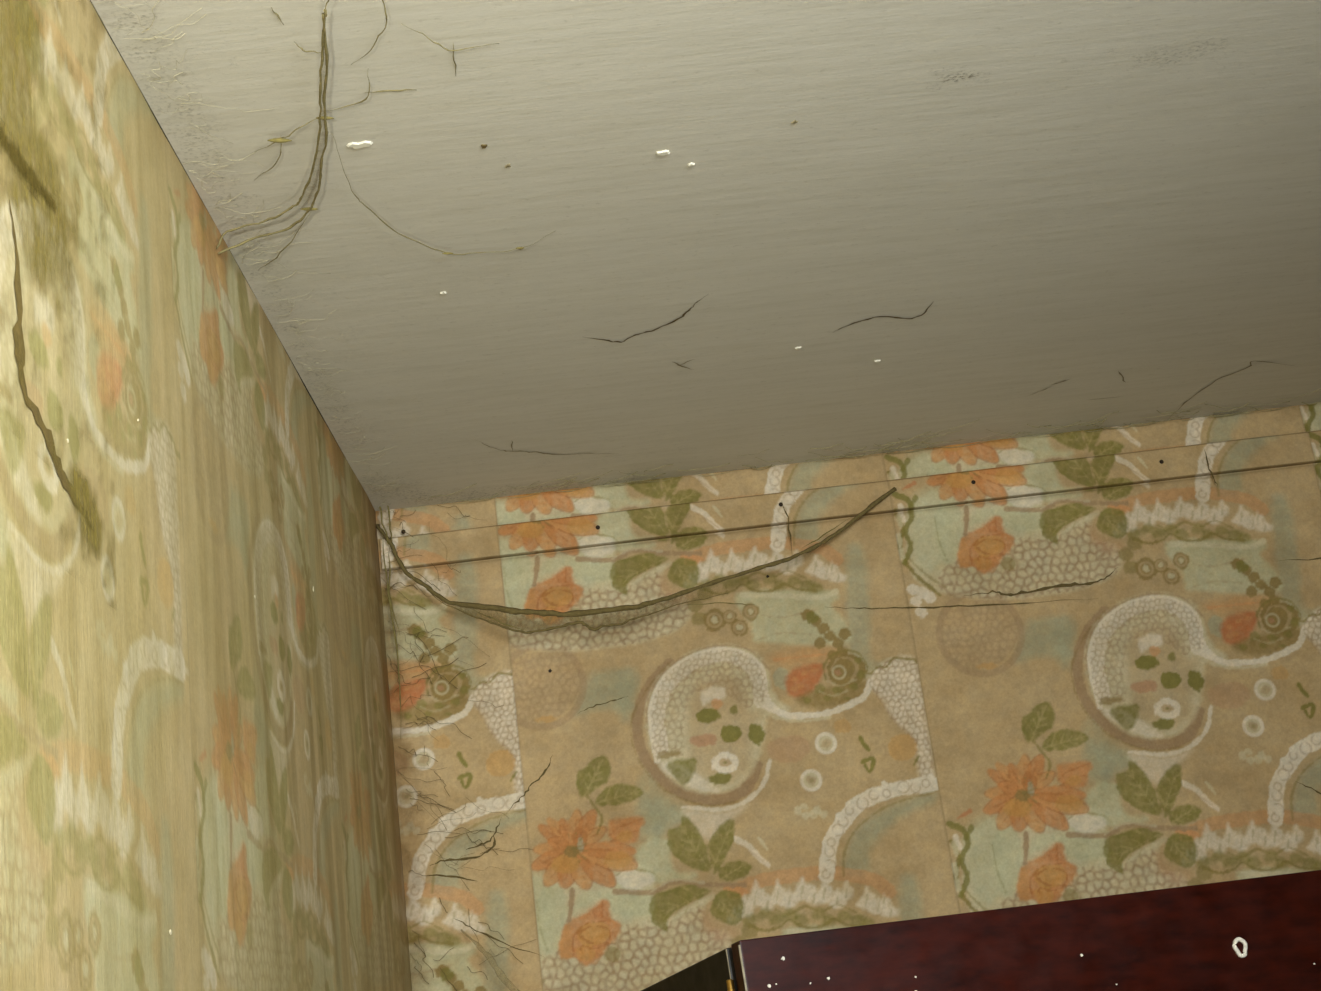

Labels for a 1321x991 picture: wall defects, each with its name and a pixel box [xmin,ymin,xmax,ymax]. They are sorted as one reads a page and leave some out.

crack [586,295,707,343]
crack [834,304,932,332]
crack [9,200,90,524]
crack [828,571,1114,609]
crack [430,755,553,881]
crack [456,919,544,957]